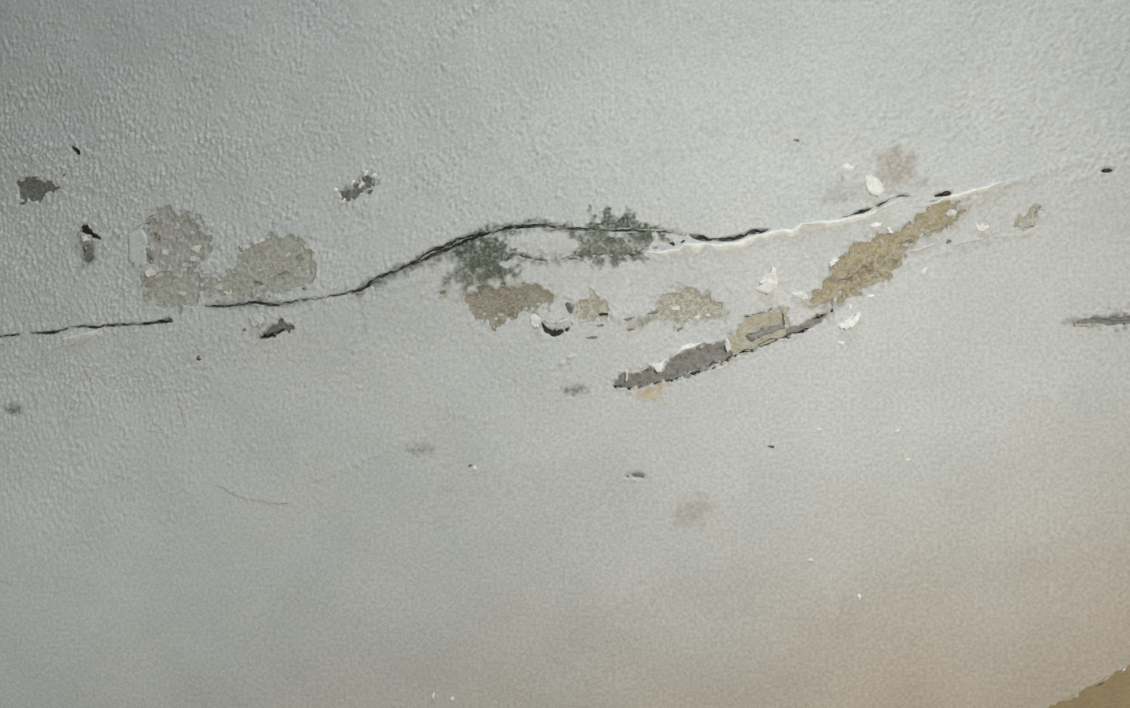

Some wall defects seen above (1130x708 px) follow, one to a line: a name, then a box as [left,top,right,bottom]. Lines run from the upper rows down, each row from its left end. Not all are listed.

flaking render [17,173,65,205]
flaking render [332,170,377,204]
peeling [842,163,884,197]
peeling [81,205,316,314]
mould [445,232,519,290]
crack [205,179,1008,332]
mould [570,205,668,265]
crack [0,320,170,345]
flaking render [243,316,295,339]
peeling [463,282,610,339]
peeling [612,200,1001,399]
flaking render [1076,315,1130,326]